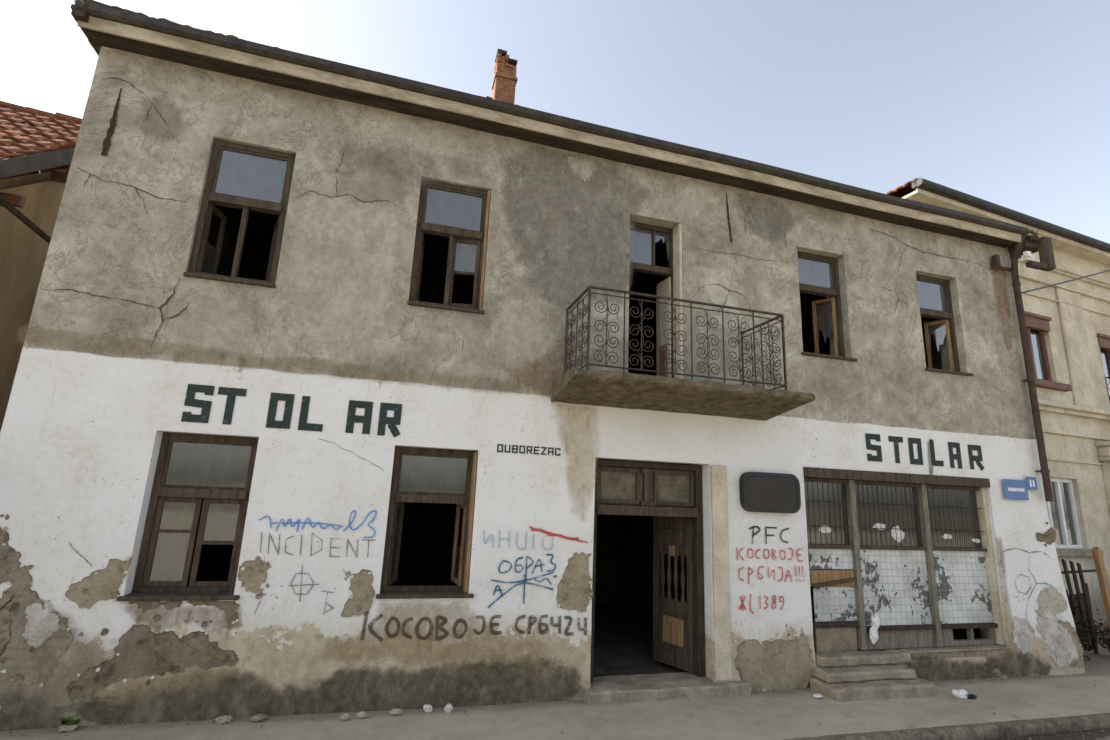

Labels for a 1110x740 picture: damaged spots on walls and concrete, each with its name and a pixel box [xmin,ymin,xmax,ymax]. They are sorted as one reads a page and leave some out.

crack [77,77,187,214]
crack [295,150,407,212]
crack [45,278,188,349]
peeling [1036,522,1058,547]
peeling [0,514,83,687]
peeling [65,556,270,702]
damp [0,655,581,731]
peeling [341,569,375,617]
peeling [553,552,594,614]
peeling [734,624,814,691]
peeling [1037,582,1085,669]